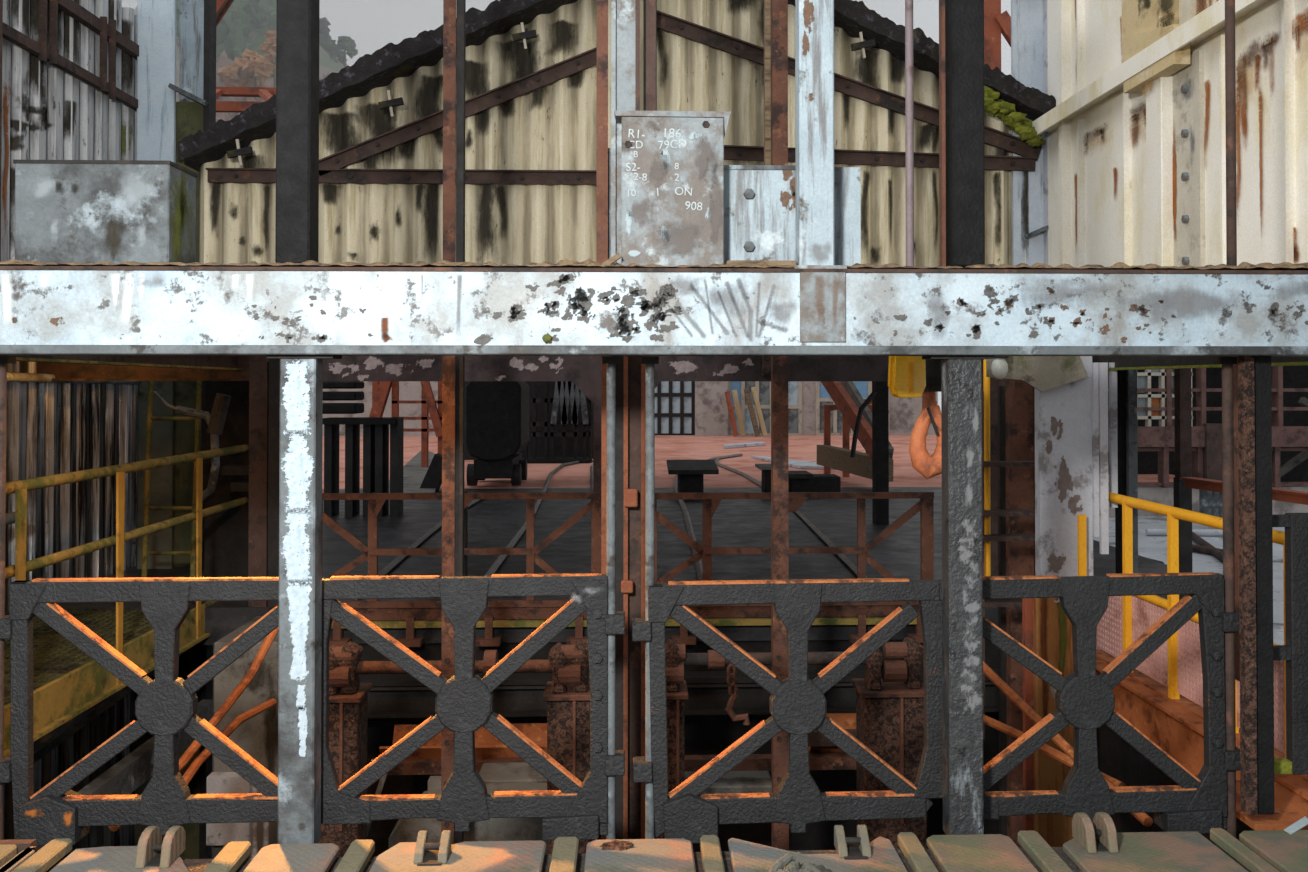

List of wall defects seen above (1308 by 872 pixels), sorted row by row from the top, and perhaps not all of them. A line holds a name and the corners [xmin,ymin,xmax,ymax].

water stain [500,20,575,81]
rust [802,0,815,57]
water stain [324,103,396,153]
rust [1130,103,1146,147]
rust [1236,11,1308,226]
water stain [416,184,438,253]
water stain [477,184,507,251]
water stain [861,172,870,246]
peeling [252,296,326,343]
peeling [482,274,682,343]
peeling [923,284,1176,343]
peeling [281,360,315,757]